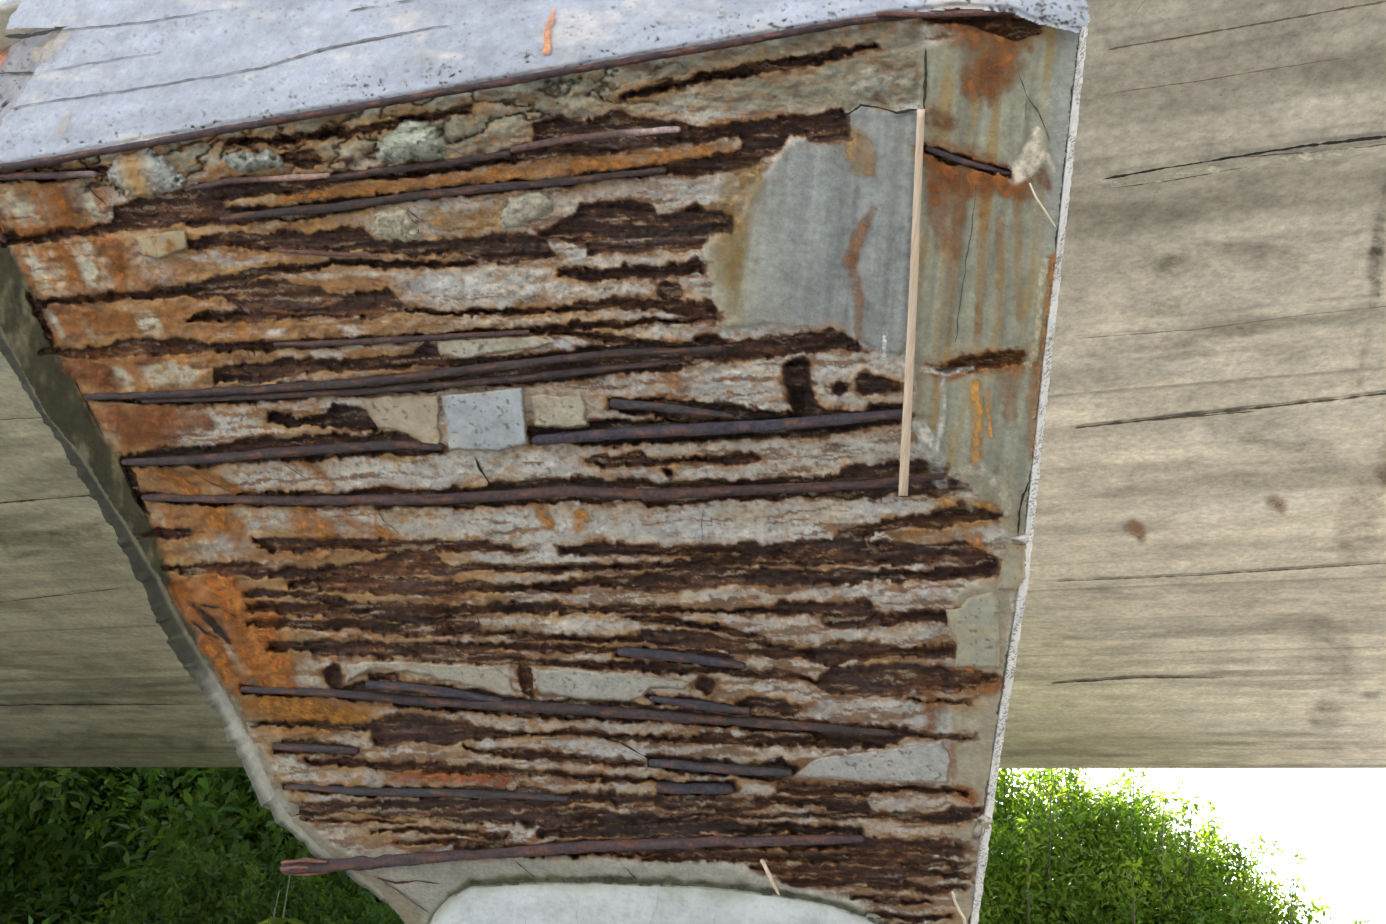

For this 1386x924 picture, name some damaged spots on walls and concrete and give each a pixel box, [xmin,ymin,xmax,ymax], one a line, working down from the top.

spalling [0,28,61,127]
crack [833,48,928,121]
spalling [923,15,1041,40]
corrosion [941,8,1034,108]
corrosion [277,145,731,202]
corrosion [843,208,877,331]
corrosion [923,144,1057,475]
corrosion [159,468,243,542]
spalling [0,44,1030,924]
corrosion [895,496,996,552]
corrosion [170,573,367,739]
corrosion [389,772,509,787]